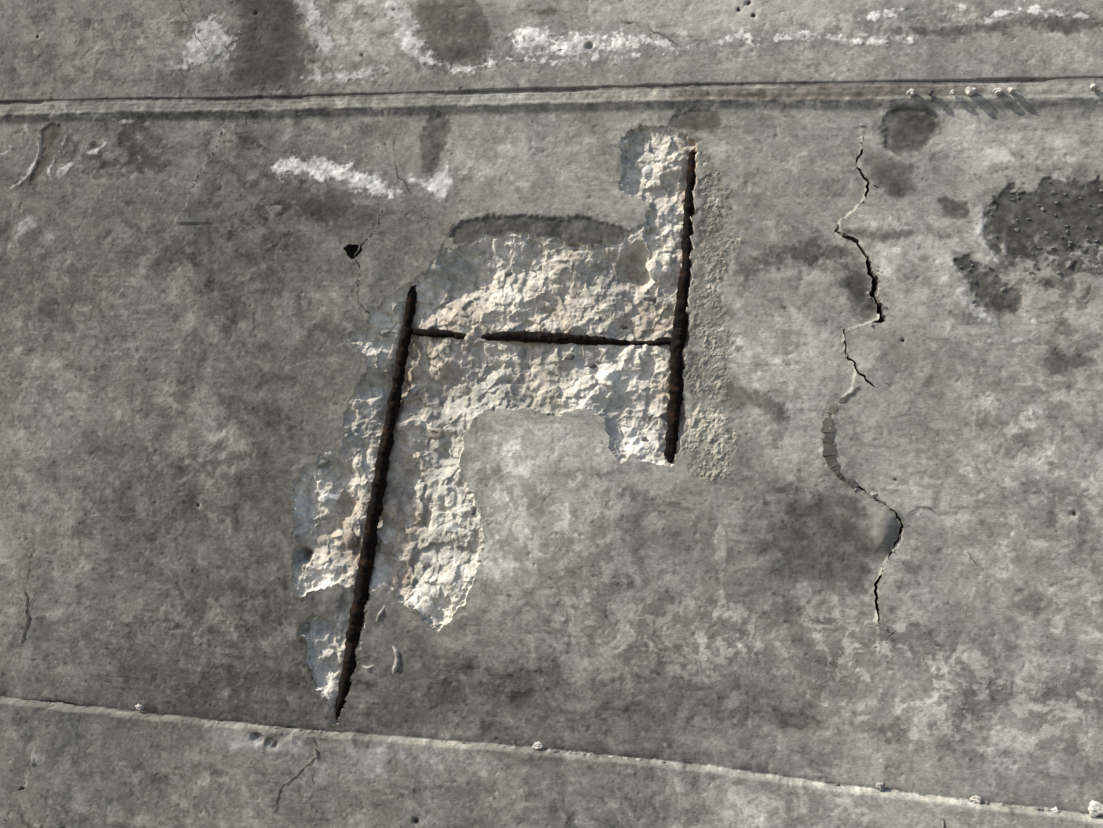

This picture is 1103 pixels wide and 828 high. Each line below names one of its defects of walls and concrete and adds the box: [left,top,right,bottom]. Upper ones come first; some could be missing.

water stain [380,0,932,74]
water stain [939,0,1088,35]
water stain [272,120,453,200]
water stain [866,108,938,196]
crack [343,141,412,313]
corrosion [481,150,696,464]
water stain [954,255,1021,313]
water stain [984,178,1103,287]
spalling [291,124,742,726]
crack [820,123,935,648]
corrosion [335,285,467,719]
crack [3,761,36,821]